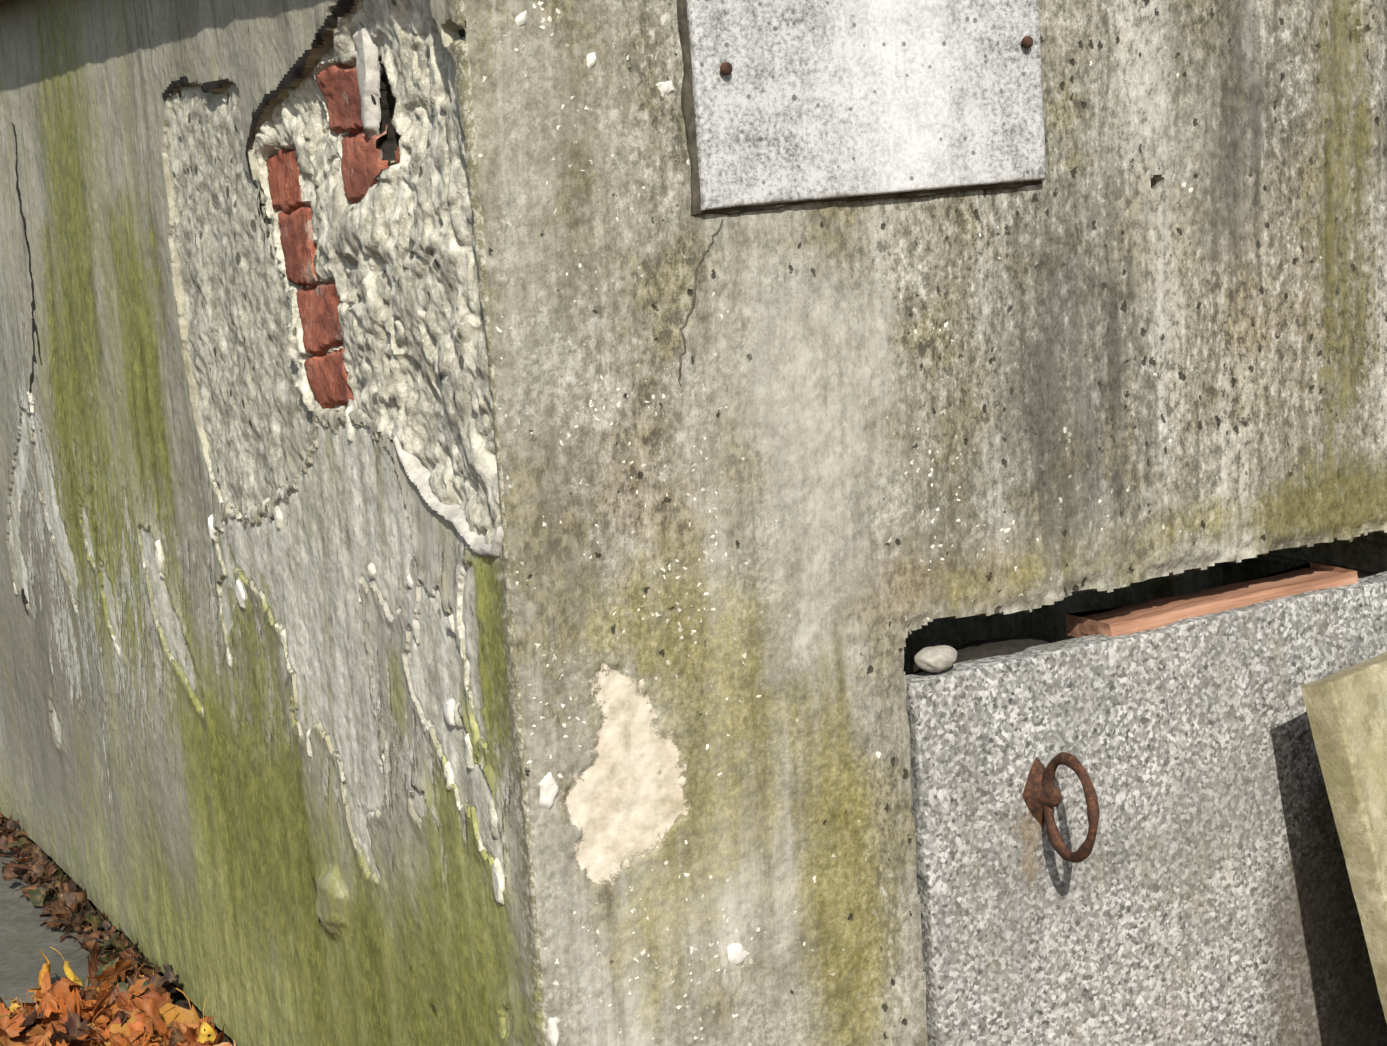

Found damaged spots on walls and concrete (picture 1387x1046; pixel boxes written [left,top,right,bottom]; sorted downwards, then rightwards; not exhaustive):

crack [12,123,42,411]
crack [678,219,724,386]
peeling [52,706,63,745]
peeling [9,391,120,648]
peeling [140,527,206,718]
spalling [162,0,506,905]
peeling [539,662,692,887]